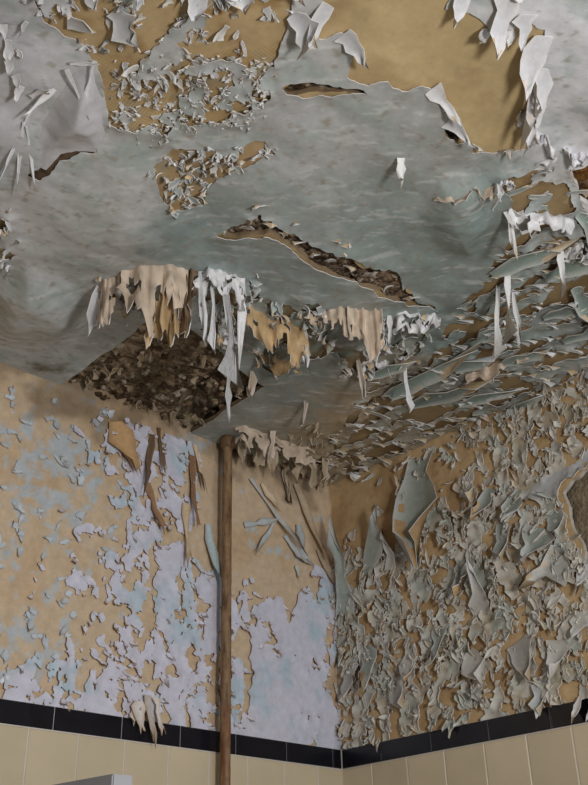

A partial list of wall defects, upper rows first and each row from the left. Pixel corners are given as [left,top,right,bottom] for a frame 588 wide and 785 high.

peeling [0,208,21,272]
peeling [0,21,29,102]
crack [285,83,332,92]
peeling [33,0,588,490]
crack [227,205,421,301]
peeling [0,407,222,749]
peeling [231,425,342,750]
peeling [327,369,588,751]